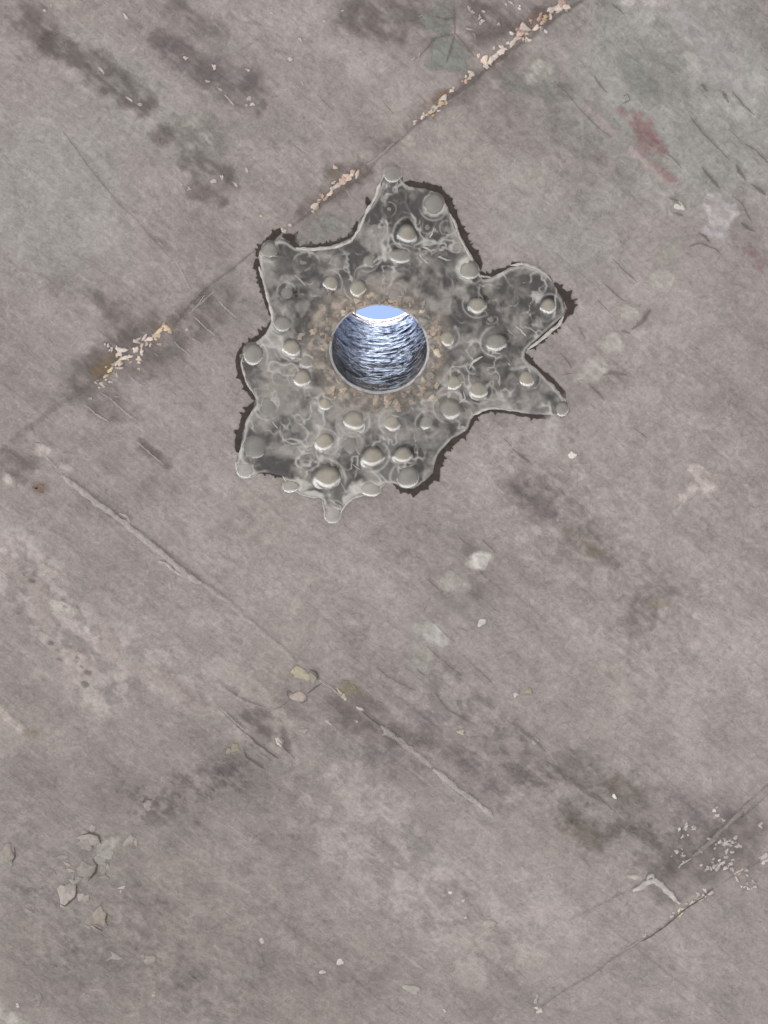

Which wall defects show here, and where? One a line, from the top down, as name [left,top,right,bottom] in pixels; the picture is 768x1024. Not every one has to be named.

spalling [413,0,572,125]
spalling [310,164,360,213]
spalling [89,322,189,400]
damp [234,164,578,524]
damp [577,332,624,381]
damp [440,553,491,593]
damp [410,623,447,668]
crack [275,669,322,709]
crack [220,708,295,770]
peeling [44,824,138,932]
crack [627,852,768,949]
crack [534,994,543,1013]